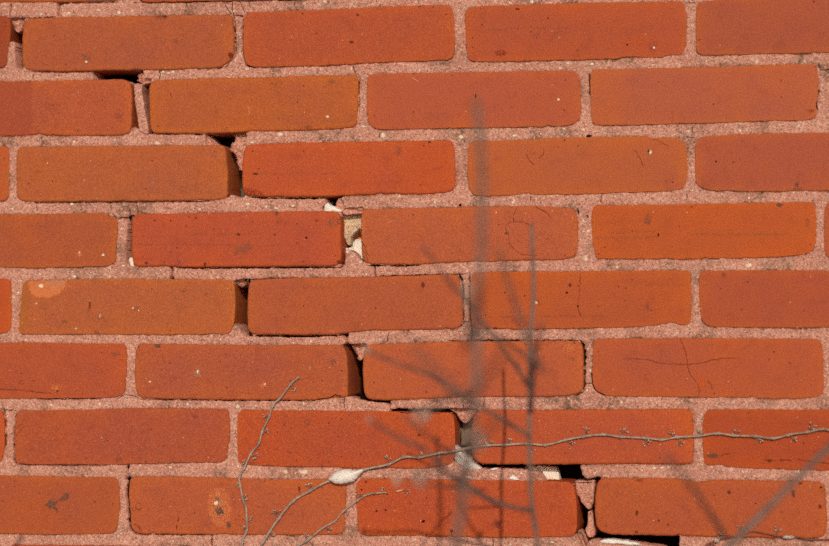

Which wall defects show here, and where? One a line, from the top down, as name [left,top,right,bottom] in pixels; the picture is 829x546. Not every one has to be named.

crack [157,134,236,148]
crack [66,201,202,219]
crack [246,188,339,222]
crack [505,196,551,256]
crack [361,241,428,276]
crack [173,266,343,289]
crack [247,324,343,338]
crack [456,274,605,396]
crack [625,339,730,397]
crack [119,360,601,479]
crack [127,464,213,546]